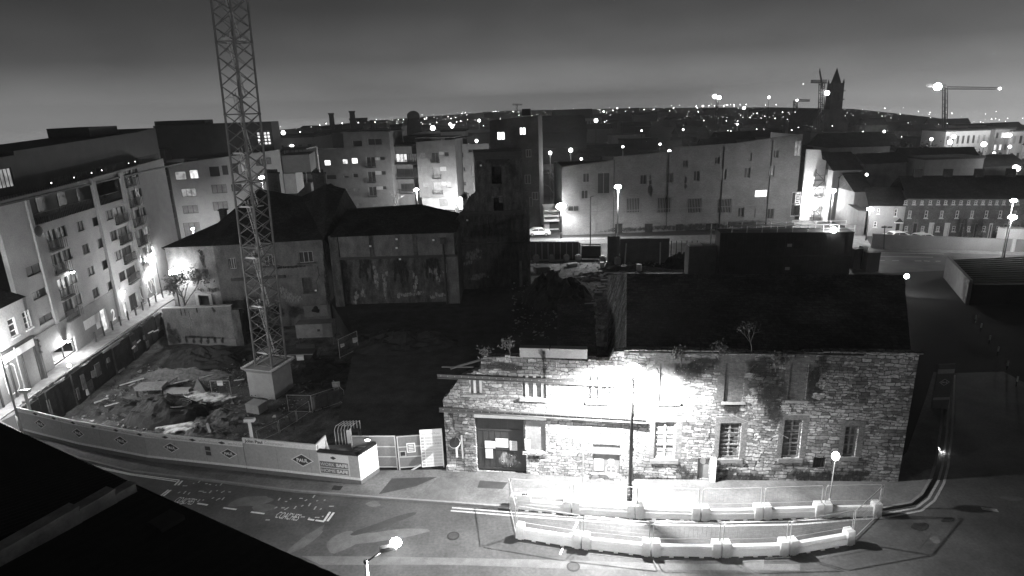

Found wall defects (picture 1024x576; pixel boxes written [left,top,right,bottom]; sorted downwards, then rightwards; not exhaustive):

water stain [762,383,787,426]
water stain [807,372,822,402]